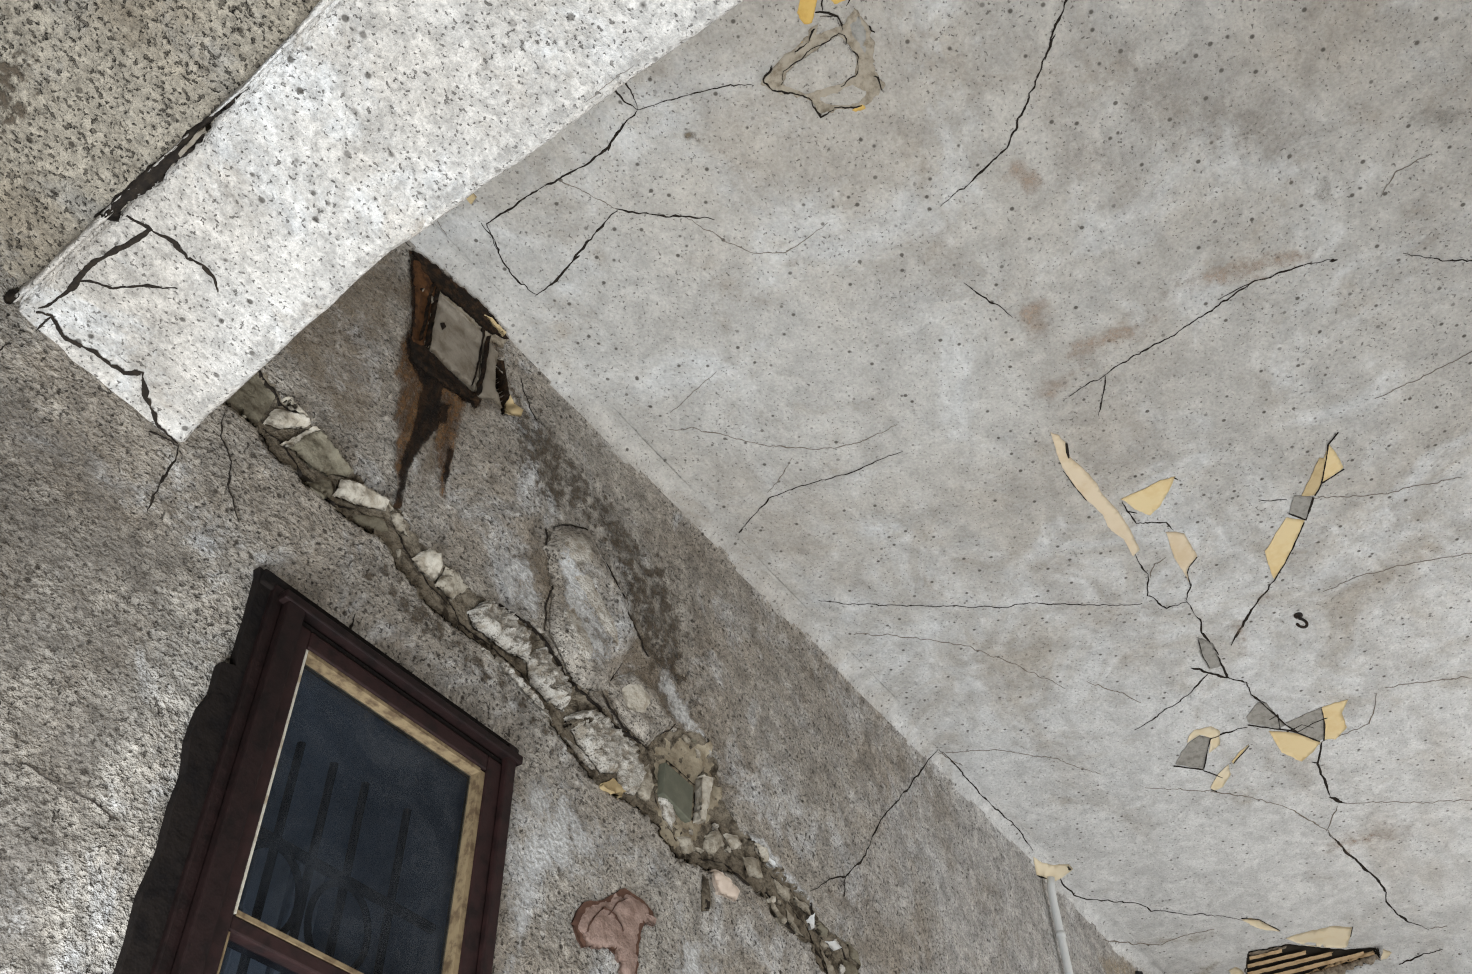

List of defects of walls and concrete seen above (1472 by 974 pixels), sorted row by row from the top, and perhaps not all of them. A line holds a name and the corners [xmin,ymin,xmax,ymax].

crack [481,65,827,295]
spalling [761,0,885,118]
crack [940,0,1068,207]
crack [0,213,219,512]
rust [393,251,481,509]
crack [1070,259,1338,416]
peeling [1265,432,1345,582]
crack [811,749,1099,896]
peeling [1173,726,1249,792]
peeling [1246,695,1348,762]
crack [1145,676,1472,965]
peeling [1229,918,1392,974]